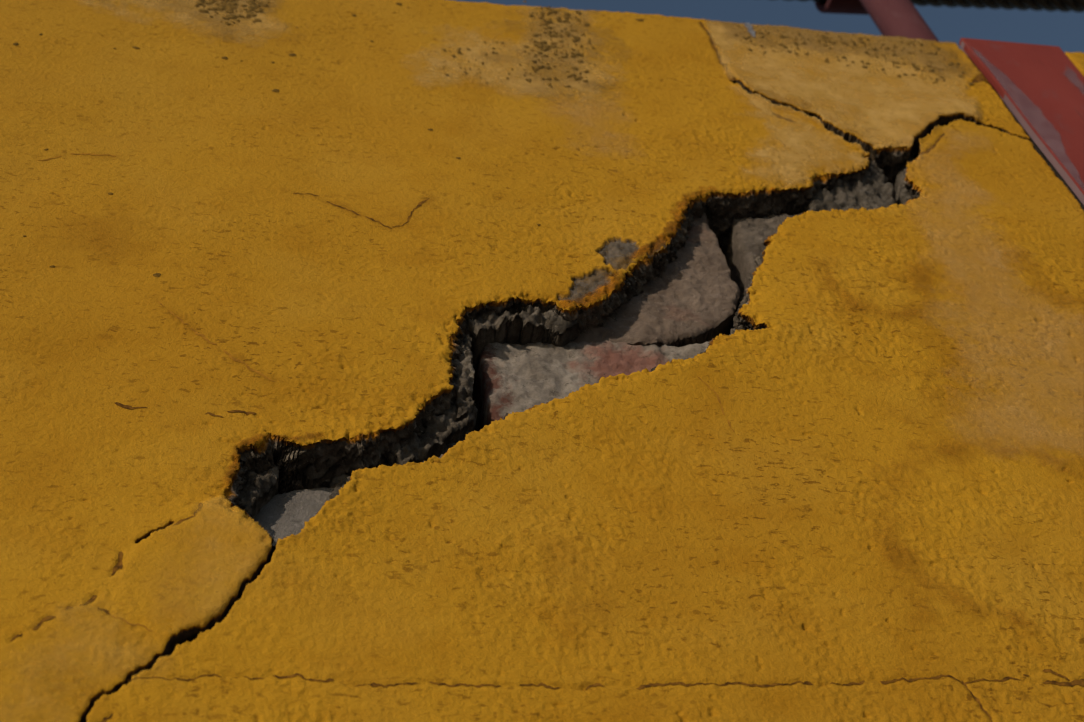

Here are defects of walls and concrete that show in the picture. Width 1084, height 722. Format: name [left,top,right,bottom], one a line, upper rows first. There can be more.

crack [699,22,877,162]
crack [908,113,1030,160]
crack [294,193,429,229]
flaking render [211,20,976,558]
peeling [193,562,252,613]
crack [11,502,605,722]
crack [637,669,1084,722]